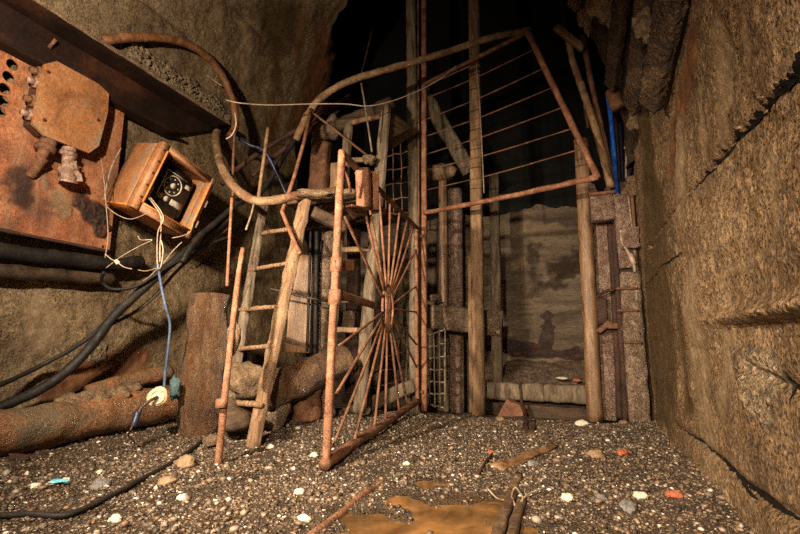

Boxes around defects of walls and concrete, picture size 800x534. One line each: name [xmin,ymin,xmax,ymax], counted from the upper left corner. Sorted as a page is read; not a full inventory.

rust [0,50,124,253]
crack [664,51,800,224]
crack [645,252,682,288]
crack [677,424,800,520]